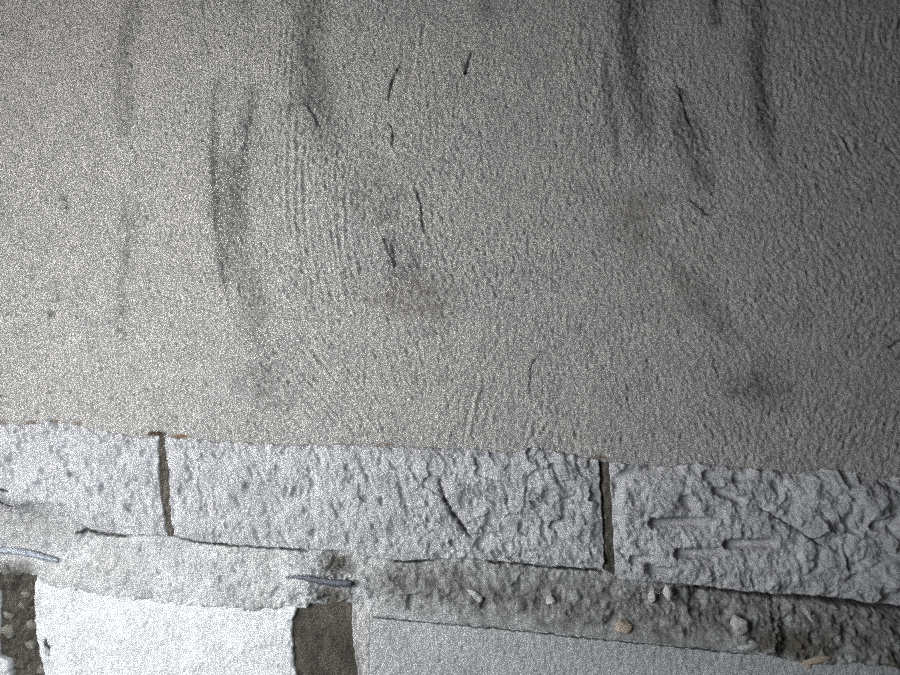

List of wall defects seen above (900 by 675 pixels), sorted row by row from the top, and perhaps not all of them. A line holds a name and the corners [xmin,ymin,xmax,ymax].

spalling [325,553,347,574]
spalling [468,589,483,603]
spalling [647,584,672,603]
spalling [730,615,748,636]
spalling [759,634,832,669]